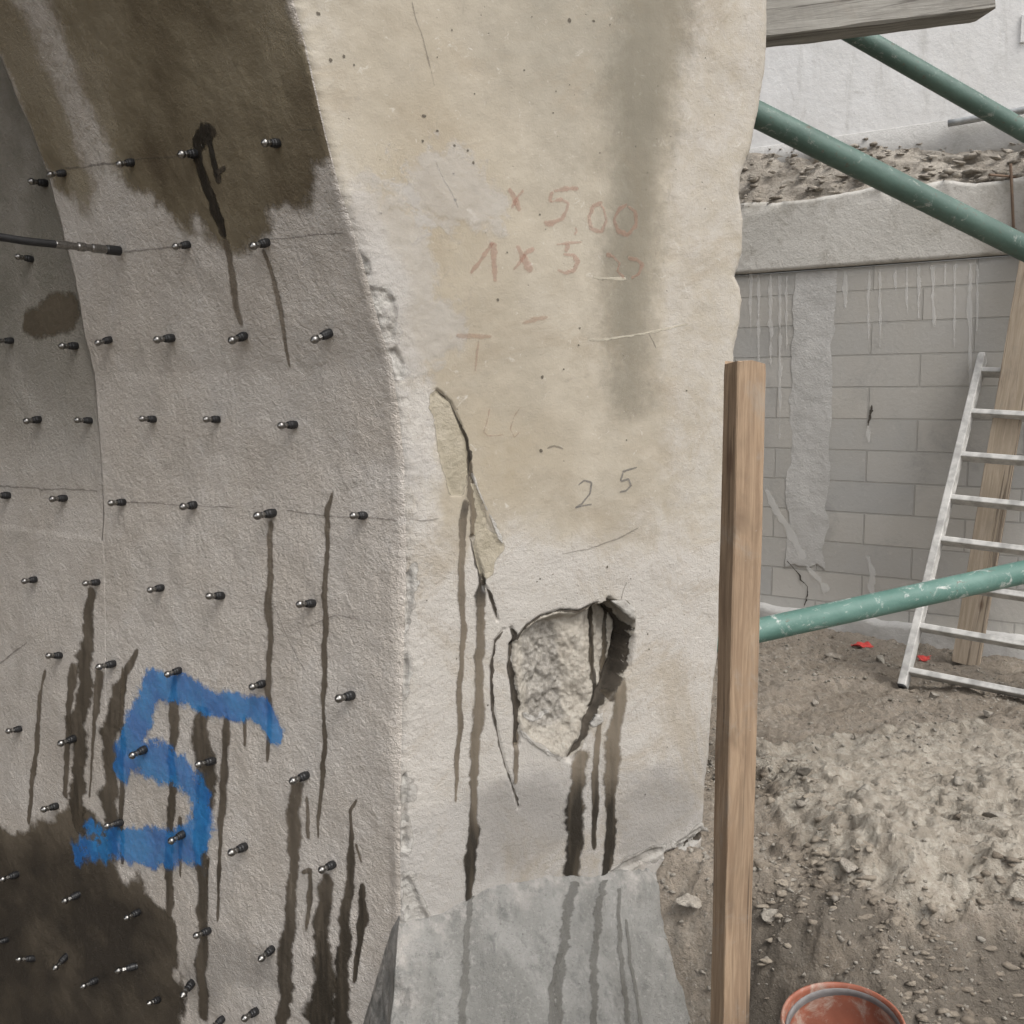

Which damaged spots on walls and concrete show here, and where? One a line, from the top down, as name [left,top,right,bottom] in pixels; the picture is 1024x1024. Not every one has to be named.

damp [0,0,89,203]
damp [53,0,331,367]
damp [23,292,80,339]
damp [0,587,230,1024]
damp [454,458,486,1024]
crack [487,589,519,806]
spalling [507,598,636,760]
damp [548,678,643,1024]
crack [787,561,808,606]